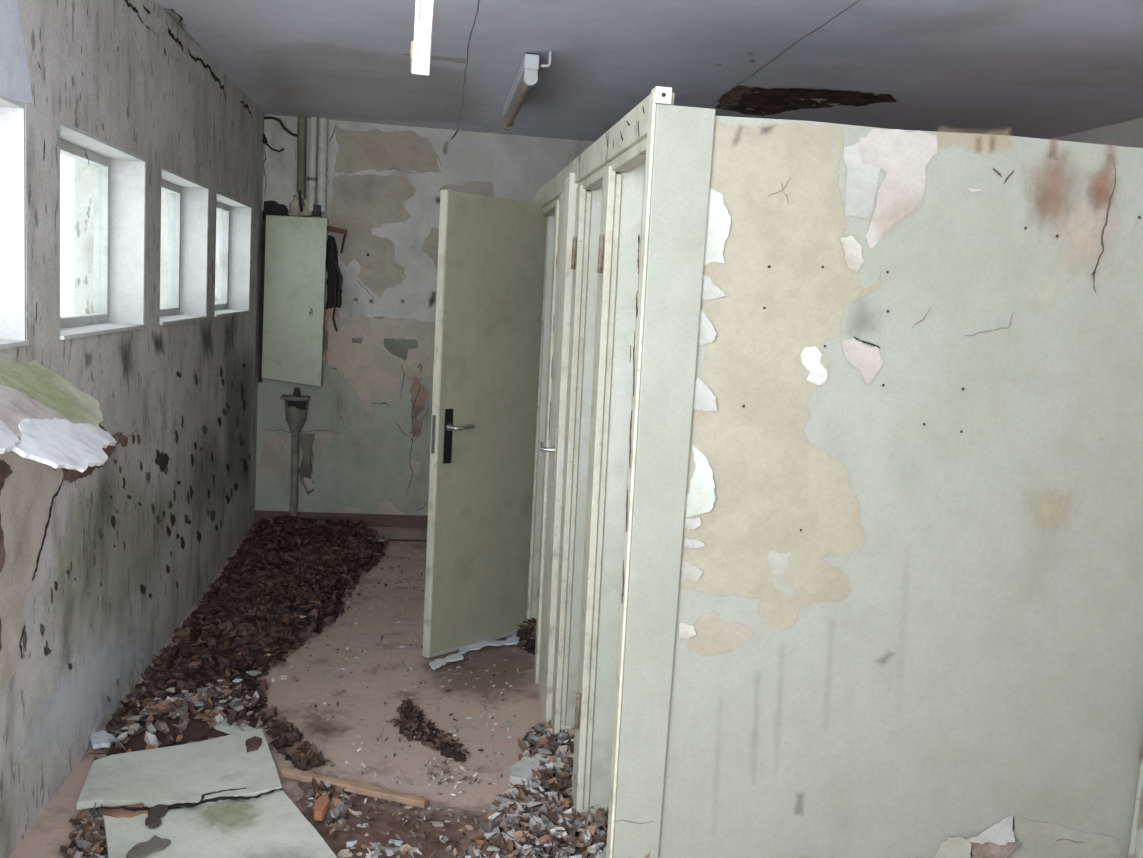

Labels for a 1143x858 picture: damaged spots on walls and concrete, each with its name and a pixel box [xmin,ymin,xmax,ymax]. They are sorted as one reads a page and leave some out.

crack [125,0,252,117]
crack [395,0,480,140]
crack [1091,162,1116,292]
peeling [191,125,494,532]
peeling [678,85,938,656]
peeling [0,415,201,699]
peeling [933,815,1122,858]